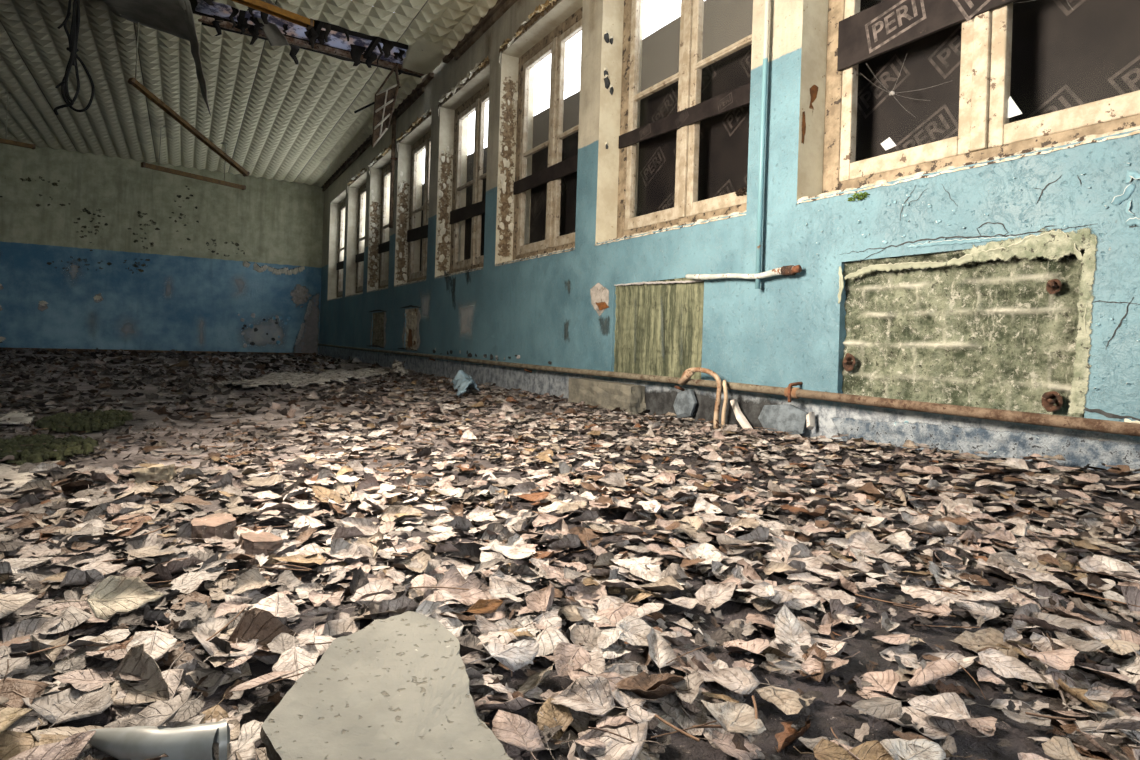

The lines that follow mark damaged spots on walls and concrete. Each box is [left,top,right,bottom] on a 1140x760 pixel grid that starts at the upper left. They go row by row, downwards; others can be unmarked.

peeling [347,0,557,289]
corrosion [801,85,818,143]
peeling [1103,163,1140,227]
peeling [237,293,320,354]
flaking render [590,278,704,379]
flaking render [838,210,1140,424]
crack [1092,299,1140,350]